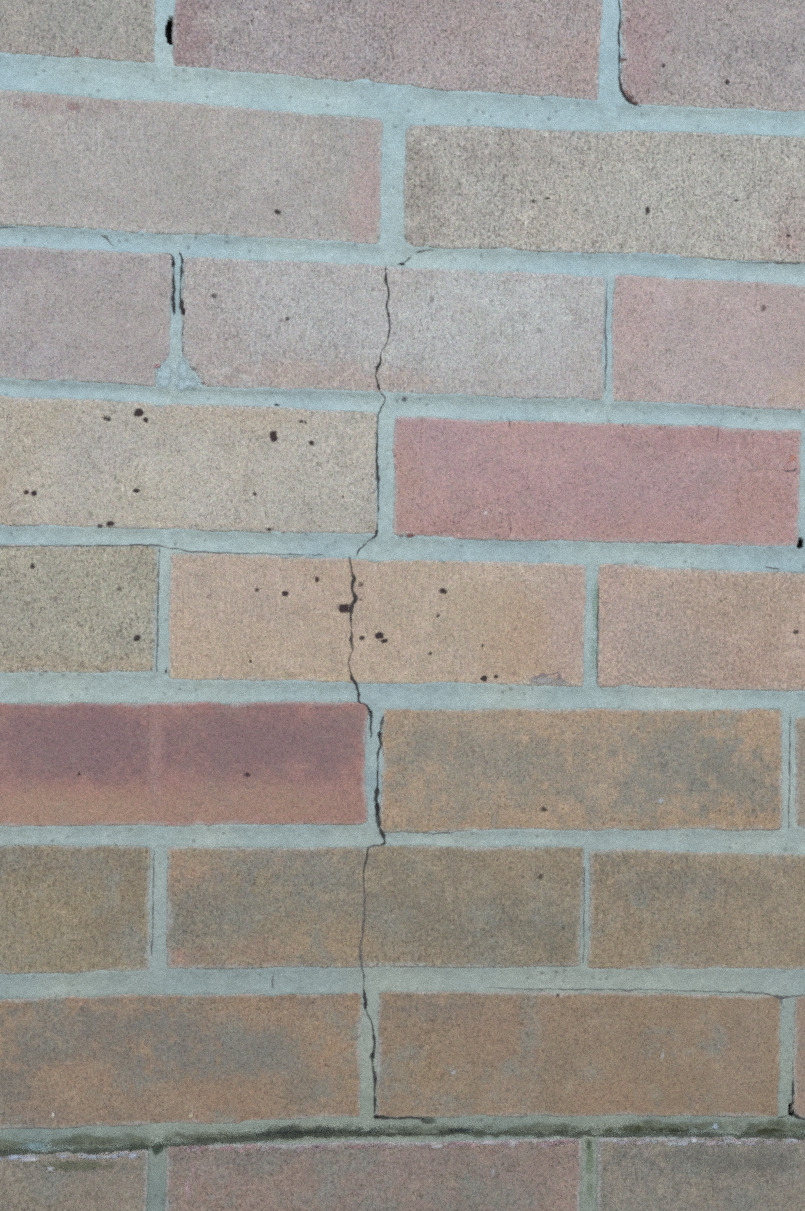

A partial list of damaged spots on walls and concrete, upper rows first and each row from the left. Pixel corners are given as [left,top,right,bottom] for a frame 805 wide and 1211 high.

crack [0,249,434,1119]
water stain [0,1119,805,1197]